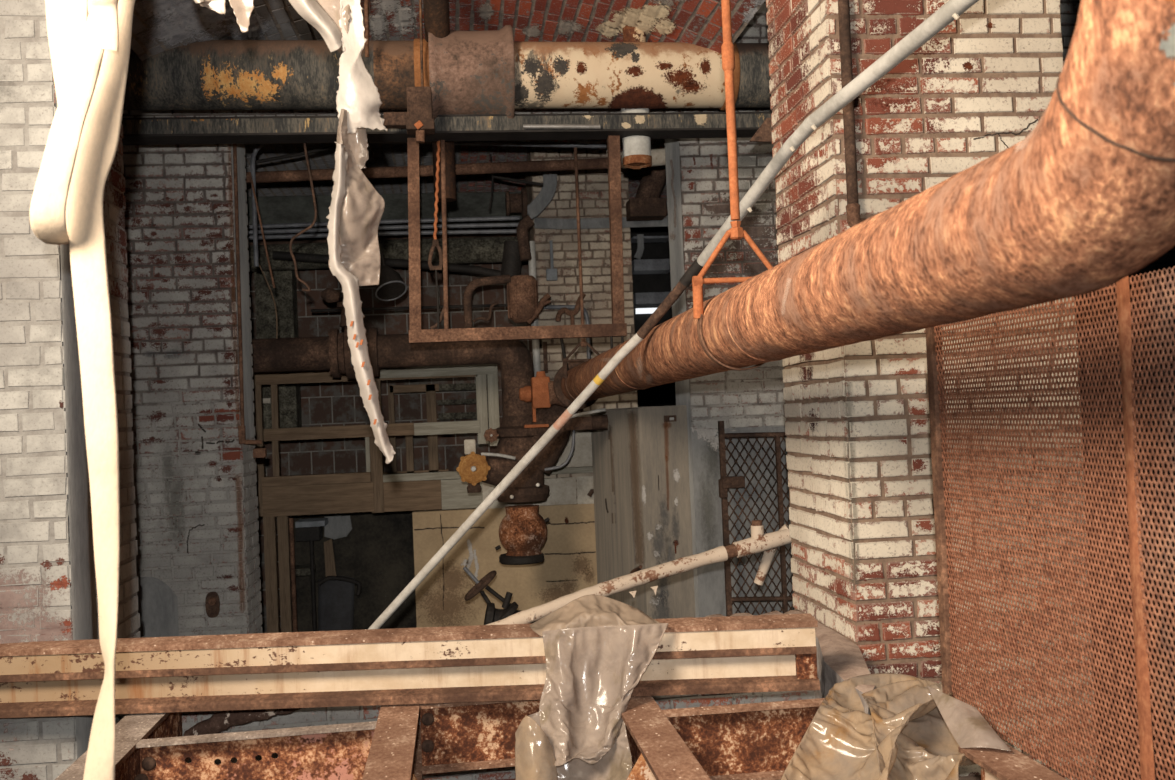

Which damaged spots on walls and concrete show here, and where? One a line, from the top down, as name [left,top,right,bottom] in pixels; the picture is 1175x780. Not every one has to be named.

peeling [830,0,944,90]
peeling [854,32,952,170]
peeling [110,153,233,351]
peeling [199,377,239,423]
peeling [206,447,243,482]
peeling [0,557,73,644]
peeling [822,566,850,607]
peeling [859,568,918,590]
peeling [857,609,942,678]